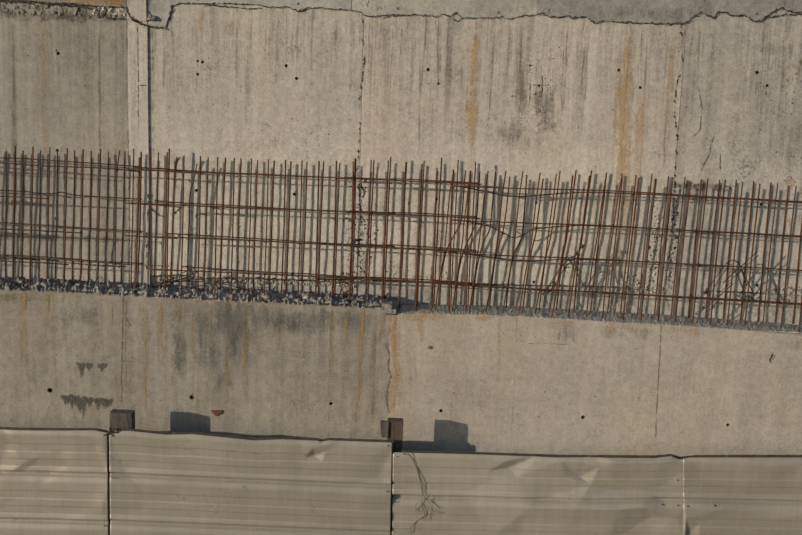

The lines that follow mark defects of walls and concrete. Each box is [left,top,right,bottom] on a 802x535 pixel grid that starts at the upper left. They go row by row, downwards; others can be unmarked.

crack [0,0,802,413]
spalling [0,146,802,334]
crack [654,328,662,437]